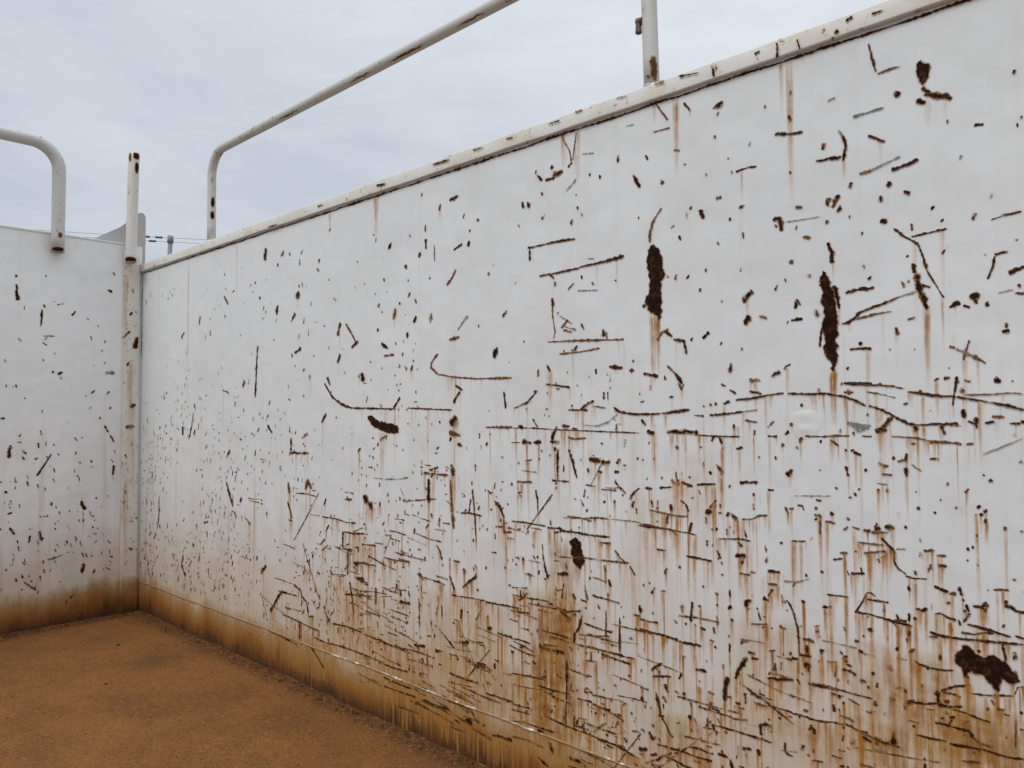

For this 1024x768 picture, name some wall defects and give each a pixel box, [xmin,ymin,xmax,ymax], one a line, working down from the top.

corrosion [125,0,971,301]
corrosion [0,366,1024,768]